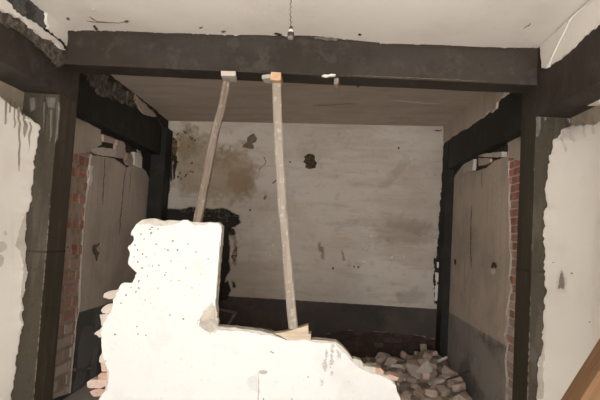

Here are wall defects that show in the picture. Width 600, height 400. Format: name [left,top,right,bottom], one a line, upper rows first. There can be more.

spalling [0,0,70,68]
damp [5,99,32,166]
spalling [84,73,156,117]
spalling [242,134,257,149]
spalling [303,154,317,169]
peeling [443,92,510,142]
flaking render [53,131,140,398]
flaking render [472,144,520,400]